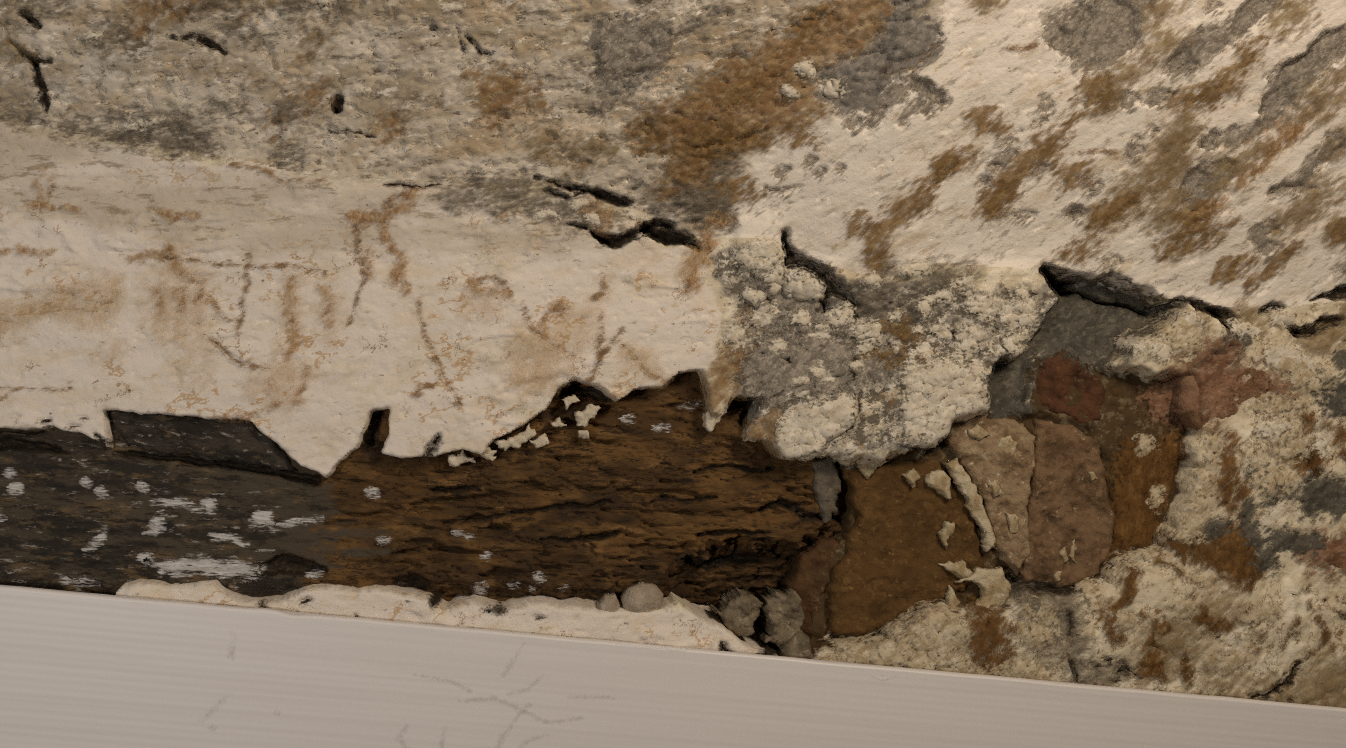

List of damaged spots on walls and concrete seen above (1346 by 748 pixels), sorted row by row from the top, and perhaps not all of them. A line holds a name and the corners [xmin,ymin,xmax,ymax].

leakage [461,63,546,130]
leakage [522,0,896,212]
crack [381,180,442,209]
crack [156,226,367,370]
flaking render [448,394,601,467]
crack [477,176,700,388]
flaking render [702,404,728,432]
leakage [699,308,756,417]
crack [782,228,853,311]
peeling [719,234,1346,633]
leakage [843,0,1346,708]
flaking render [818,457,1066,681]